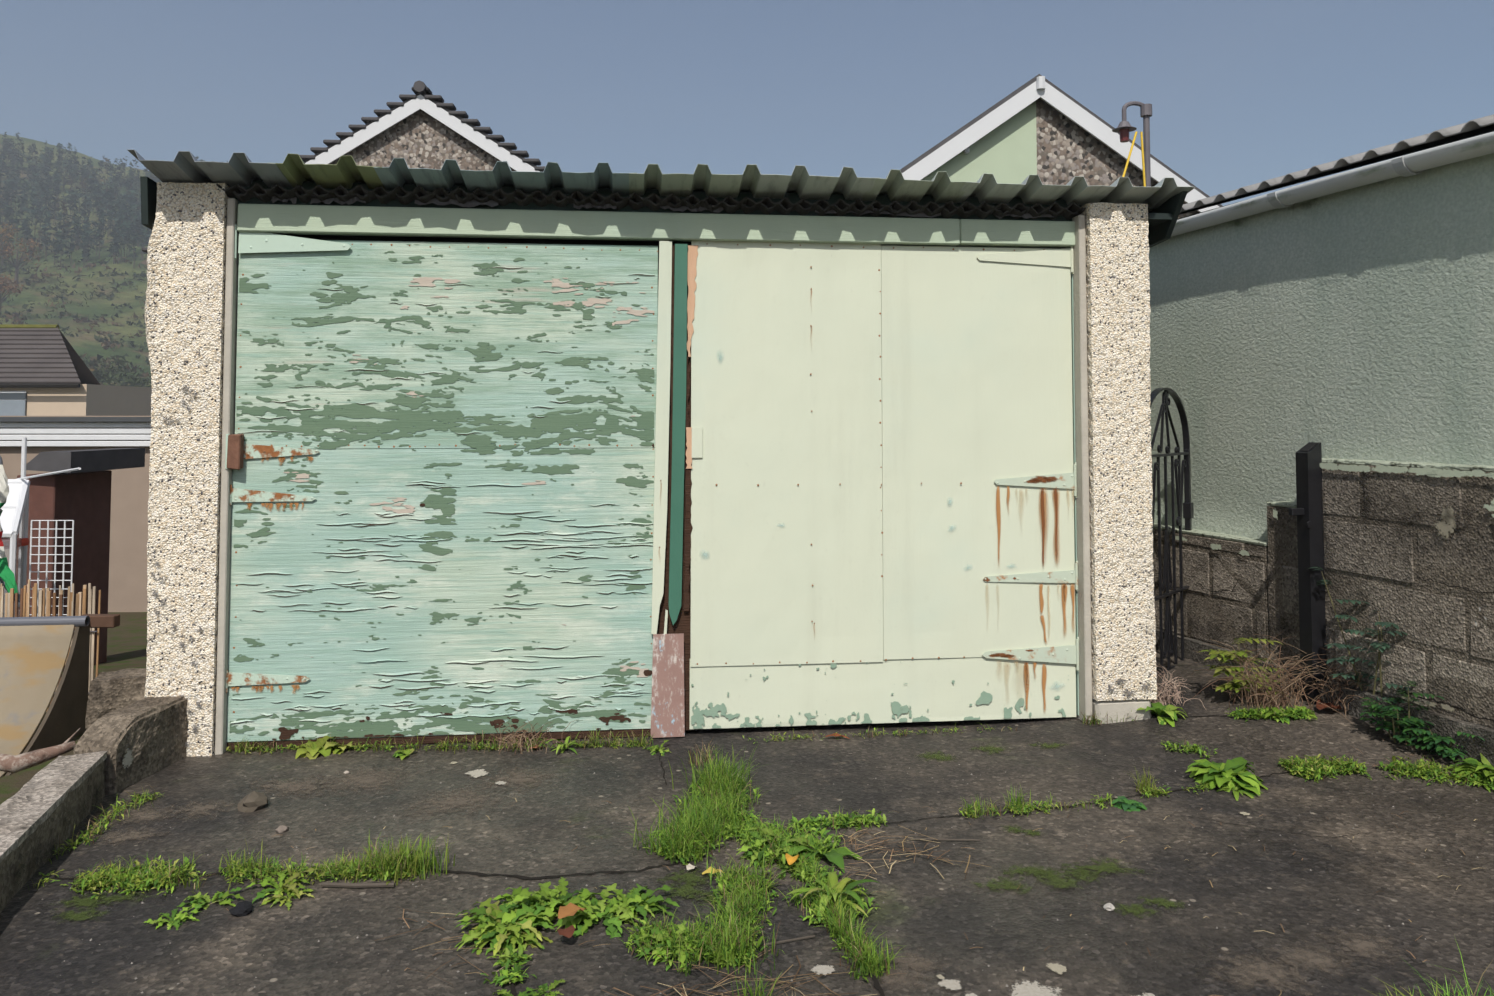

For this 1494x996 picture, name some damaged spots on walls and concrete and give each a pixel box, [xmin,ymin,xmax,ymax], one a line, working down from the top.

peeling [234,244,655,594]
corrosion [996,486,1010,561]
corrosion [1027,476,1059,565]
peeling [419,566,532,636]
corrosion [1062,584,1075,632]
corrosion [989,584,1047,710]
peeling [229,638,651,740]
peeling [691,684,872,729]
peeling [891,683,930,722]
peeling [964,683,1032,720]
crack [851,951,885,996]